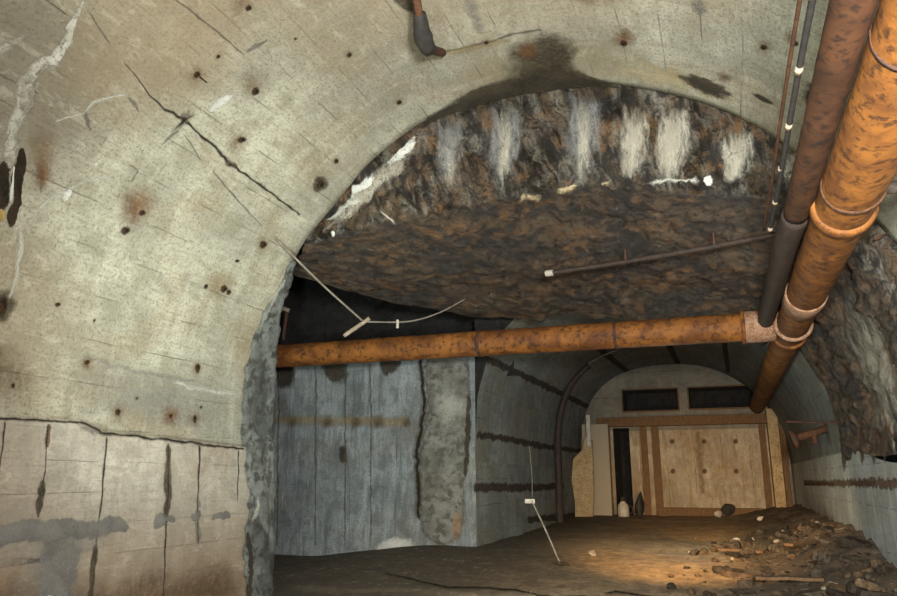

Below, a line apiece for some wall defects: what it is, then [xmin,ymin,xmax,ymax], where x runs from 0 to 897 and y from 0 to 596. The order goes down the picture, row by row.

spalling [0,148,27,227]
corrosion [121,197,146,235]
crack [124,63,300,225]
damp [331,36,732,237]
damp [723,134,753,181]
crack [0,417,244,596]